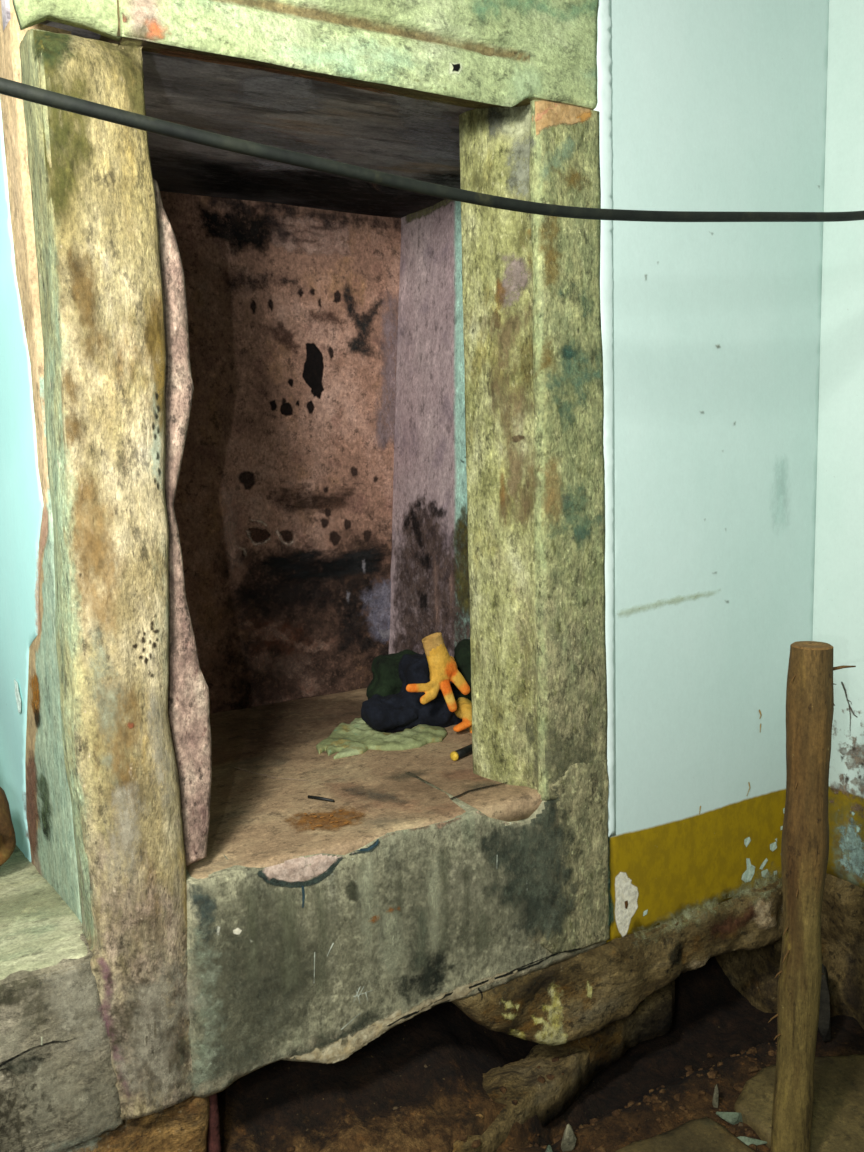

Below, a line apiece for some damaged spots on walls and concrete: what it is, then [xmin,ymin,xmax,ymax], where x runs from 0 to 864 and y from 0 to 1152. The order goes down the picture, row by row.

damp [377,298,398,447]
damp [434,508,470,621]
damp [481,725,593,940]
peeling [615,872,648,937]
peeling [656,808,785,928]
peeling [839,812,864,877]
crack [0,1039,73,1075]
damp [503,985,567,1046]